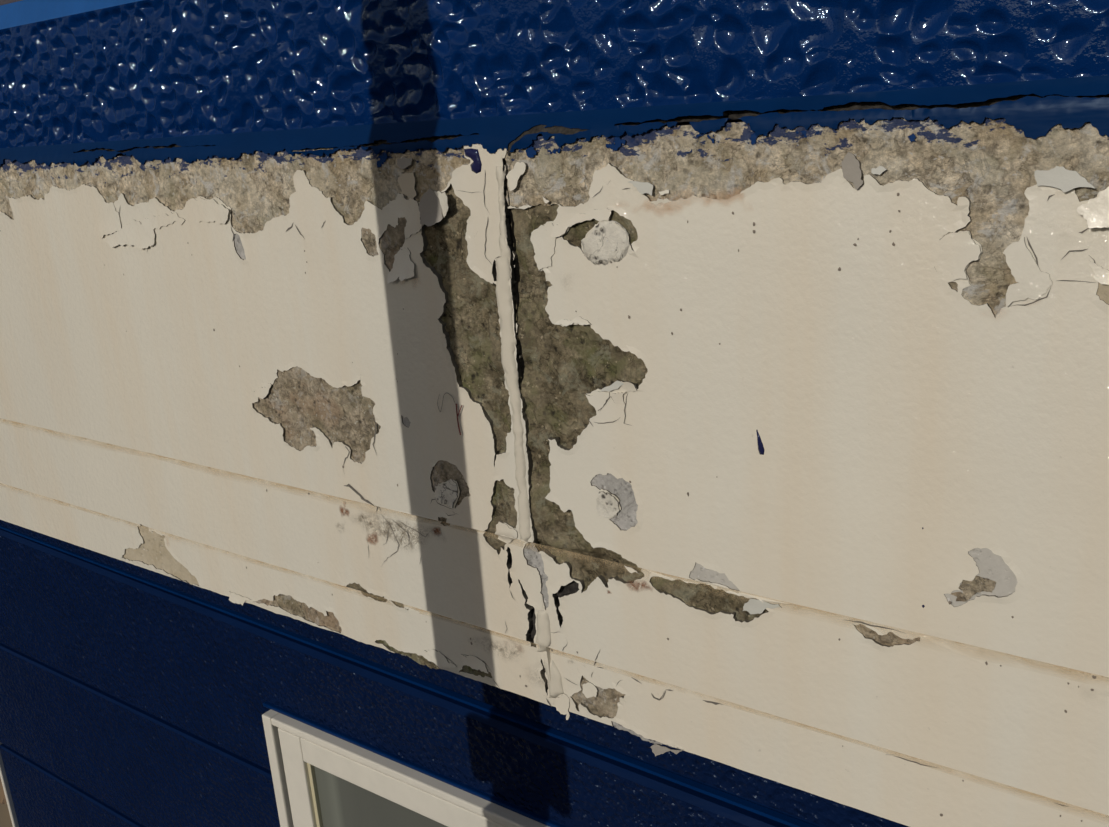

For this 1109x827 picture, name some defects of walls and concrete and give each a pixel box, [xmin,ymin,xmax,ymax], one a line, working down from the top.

peeling [0,117,1109,621]
peeling [229,591,342,632]
peeling [855,624,920,646]
peeling [549,677,683,757]